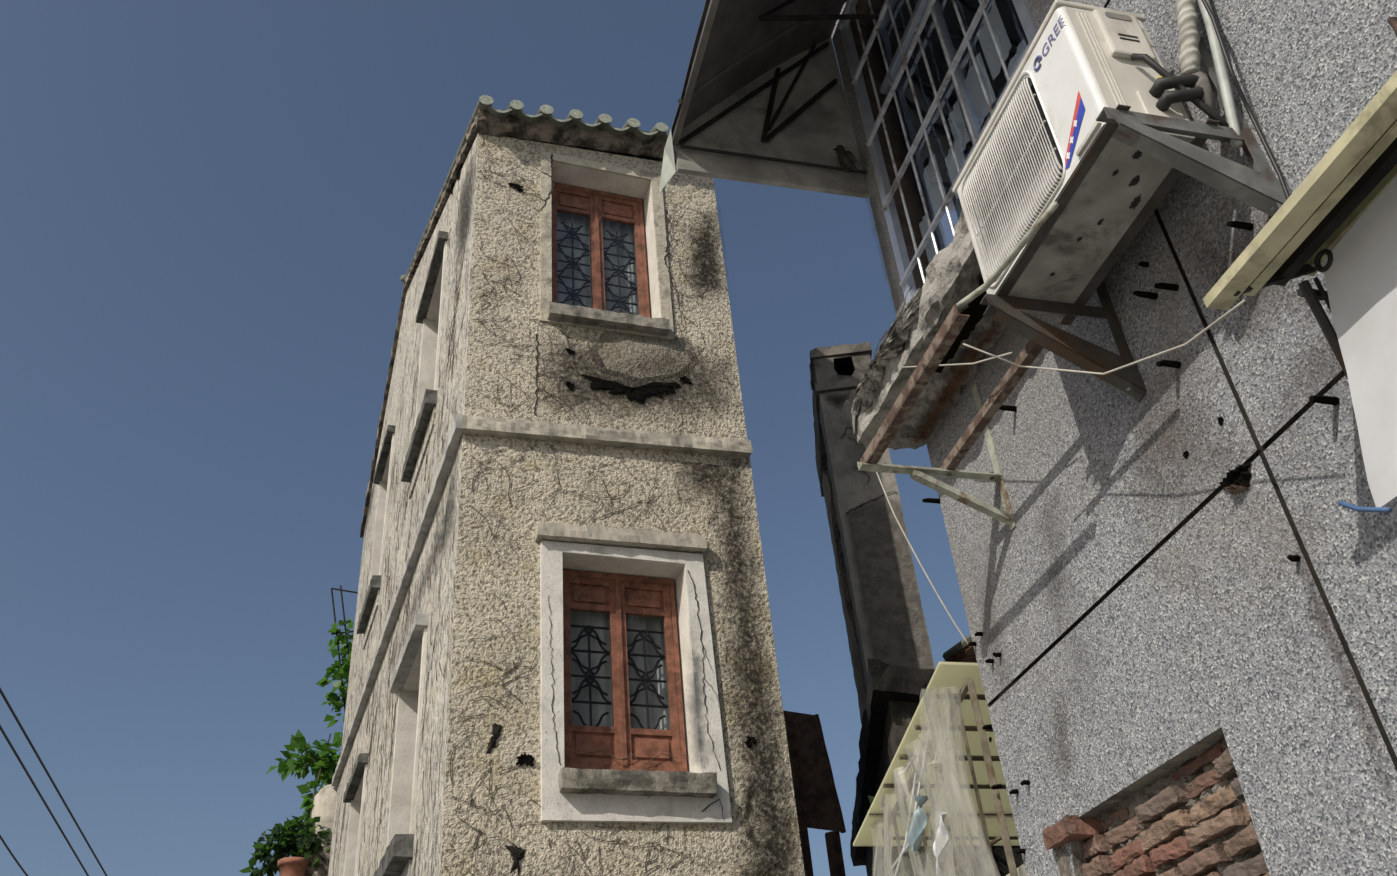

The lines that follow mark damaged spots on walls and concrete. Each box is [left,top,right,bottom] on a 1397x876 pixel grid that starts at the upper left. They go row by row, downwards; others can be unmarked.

water stain [457,171,473,252]
water stain [692,215,721,293]
spalling [851,288,922,434]
spalling [935,277,988,373]
water stain [688,461,795,876]